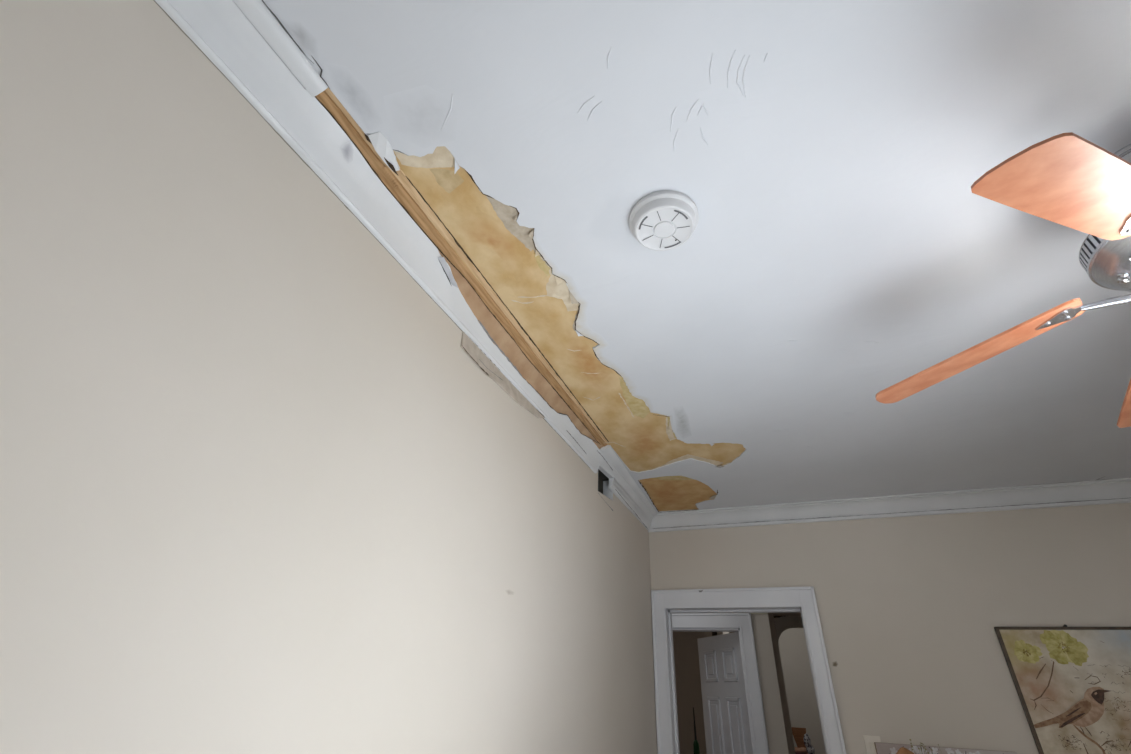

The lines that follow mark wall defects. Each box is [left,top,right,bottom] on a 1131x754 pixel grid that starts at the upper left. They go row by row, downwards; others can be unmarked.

flaking render [365,132,746,512]